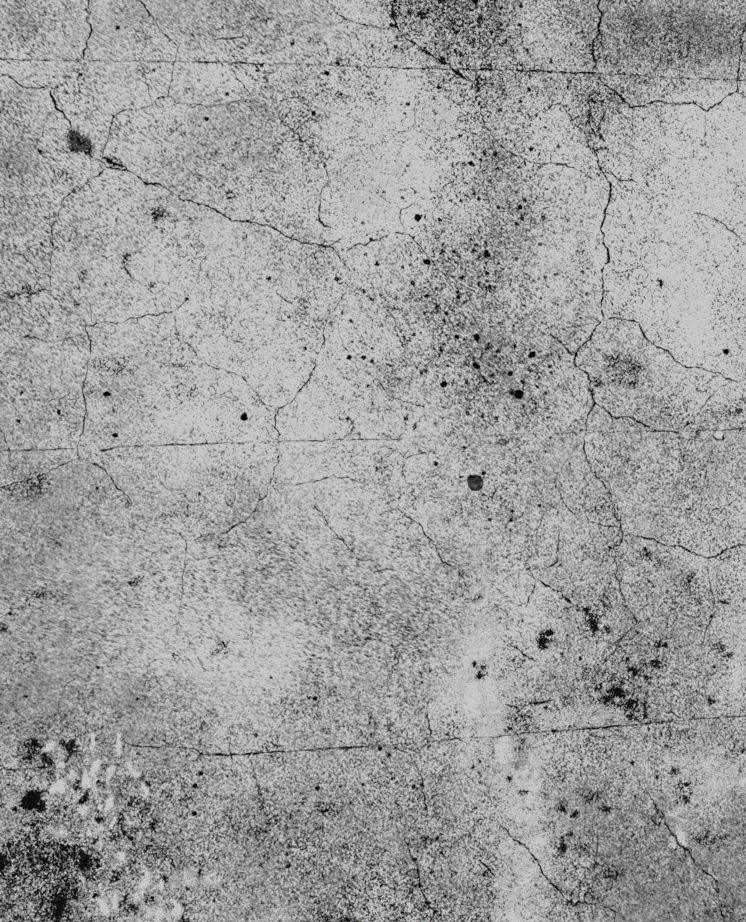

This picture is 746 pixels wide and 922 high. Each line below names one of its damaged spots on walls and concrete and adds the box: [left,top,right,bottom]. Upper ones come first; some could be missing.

damp [65,126,123,170]
crack [0,0,478,601]
crack [480,0,746,669]
damp [0,737,227,922]
damp [240,891,358,922]
crack [394,838,436,922]
crack [393,699,461,817]
crack [506,699,555,730]
crack [464,771,616,922]
crack [633,775,725,922]